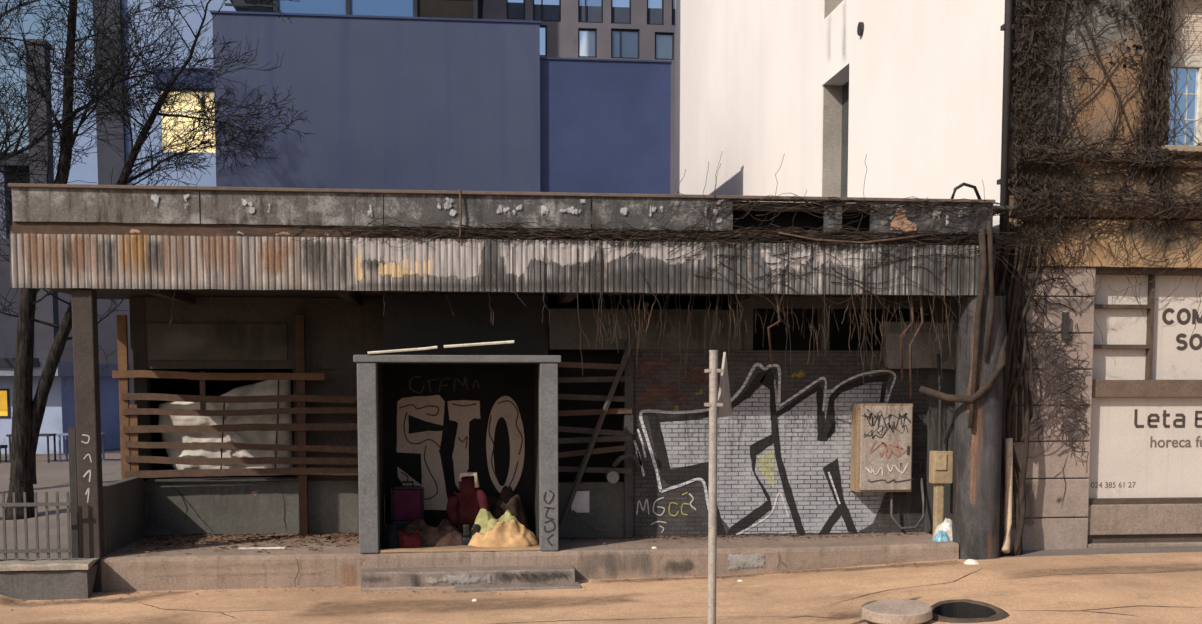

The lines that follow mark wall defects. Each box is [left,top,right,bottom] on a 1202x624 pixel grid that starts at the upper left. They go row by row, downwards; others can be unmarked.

spalling [885,208,917,231]
peeling [681,358,722,399]
crack [168,483,213,531]